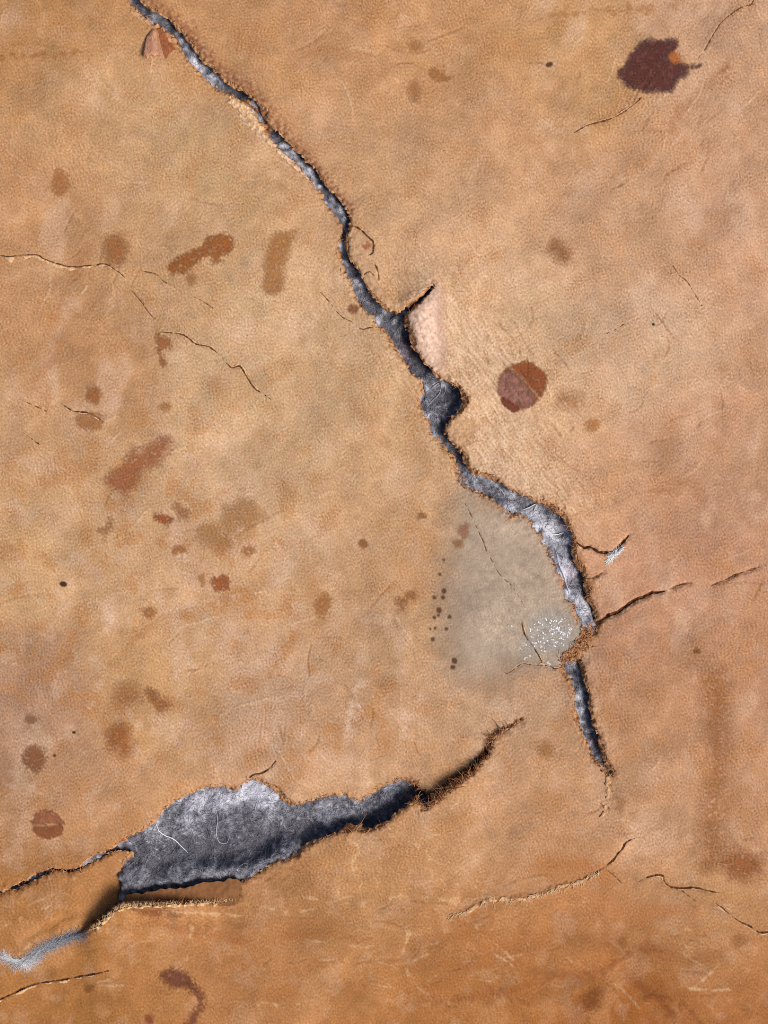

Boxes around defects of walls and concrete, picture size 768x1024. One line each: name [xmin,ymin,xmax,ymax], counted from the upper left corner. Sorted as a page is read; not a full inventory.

crack [574,92,646,133]
corrosion [168,234,233,274]
crack [353,226,380,279]
crack [0,254,270,399]
crack [461,483,561,674]
crack [577,535,629,579]
crack [599,567,759,622]
crack [447,838,768,935]
peeling [96,901,217,930]